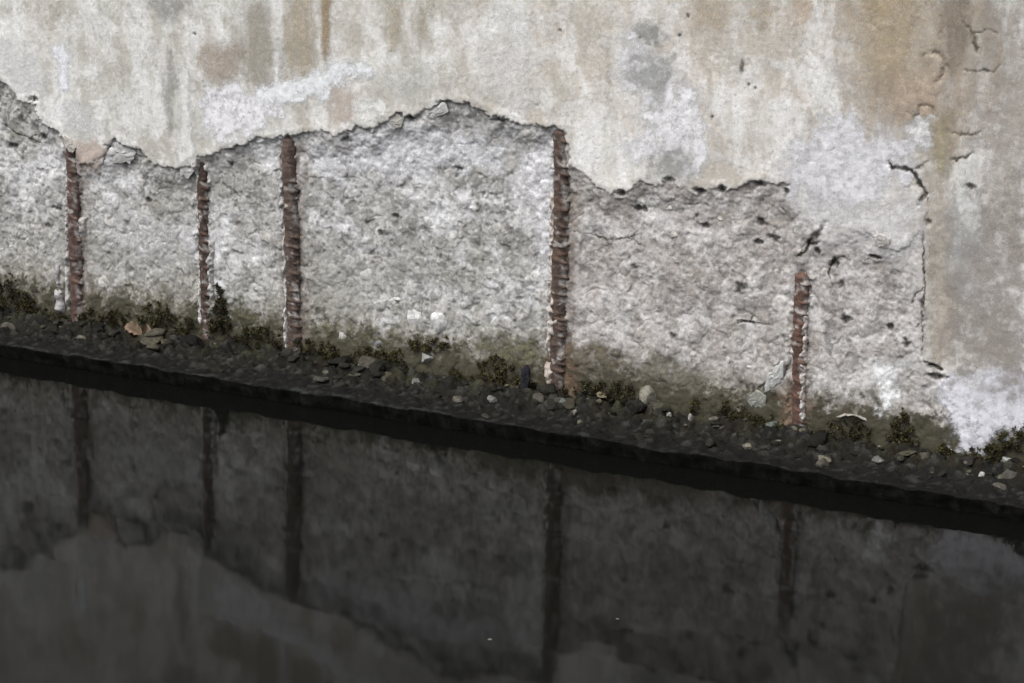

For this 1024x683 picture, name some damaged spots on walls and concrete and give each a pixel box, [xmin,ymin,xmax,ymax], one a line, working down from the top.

crack [939,23,999,78]
spalling [0,81,953,453]
leakage [777,66,934,261]
crack [888,162,944,370]
leakage [926,0,1024,455]
efflorescence [871,356,901,417]